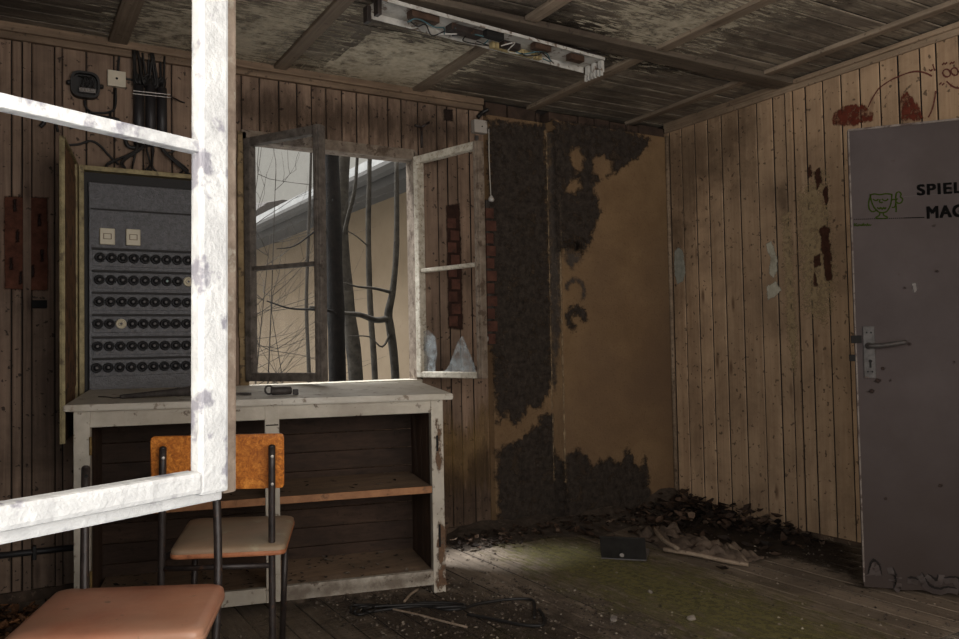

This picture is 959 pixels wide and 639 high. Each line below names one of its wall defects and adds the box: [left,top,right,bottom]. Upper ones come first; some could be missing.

spalling [485,200,498,345]